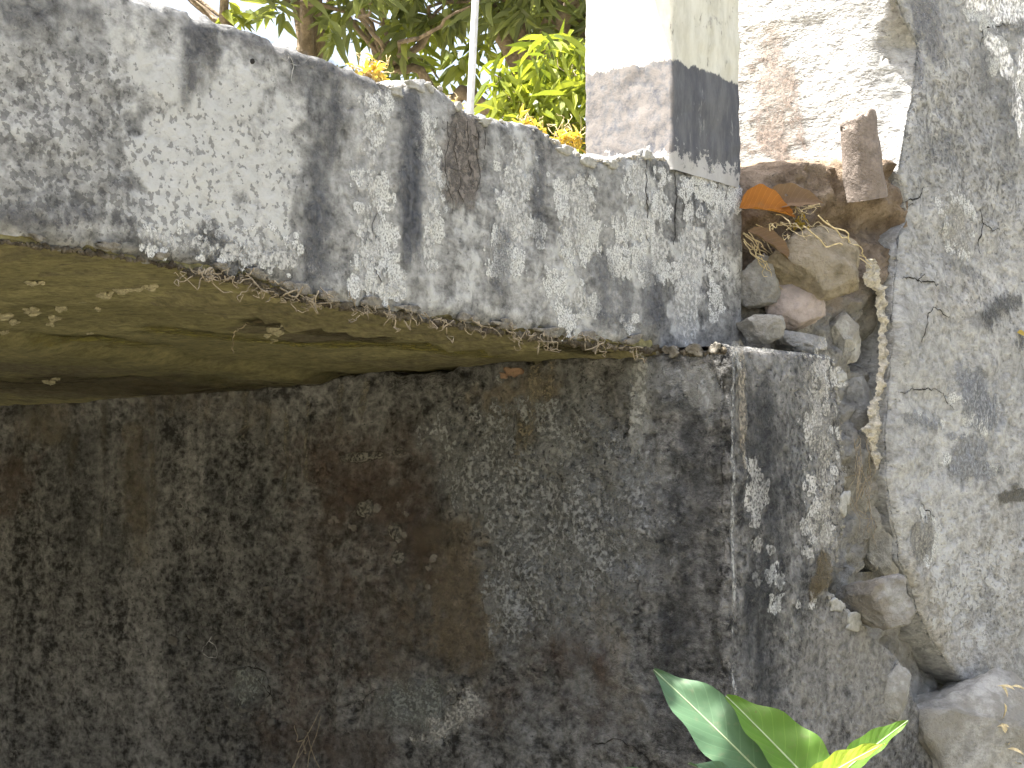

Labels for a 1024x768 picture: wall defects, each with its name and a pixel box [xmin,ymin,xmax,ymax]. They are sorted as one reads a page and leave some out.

peeling [0,79,743,358]
damp [400,93,422,264]
crack [902,274,950,342]